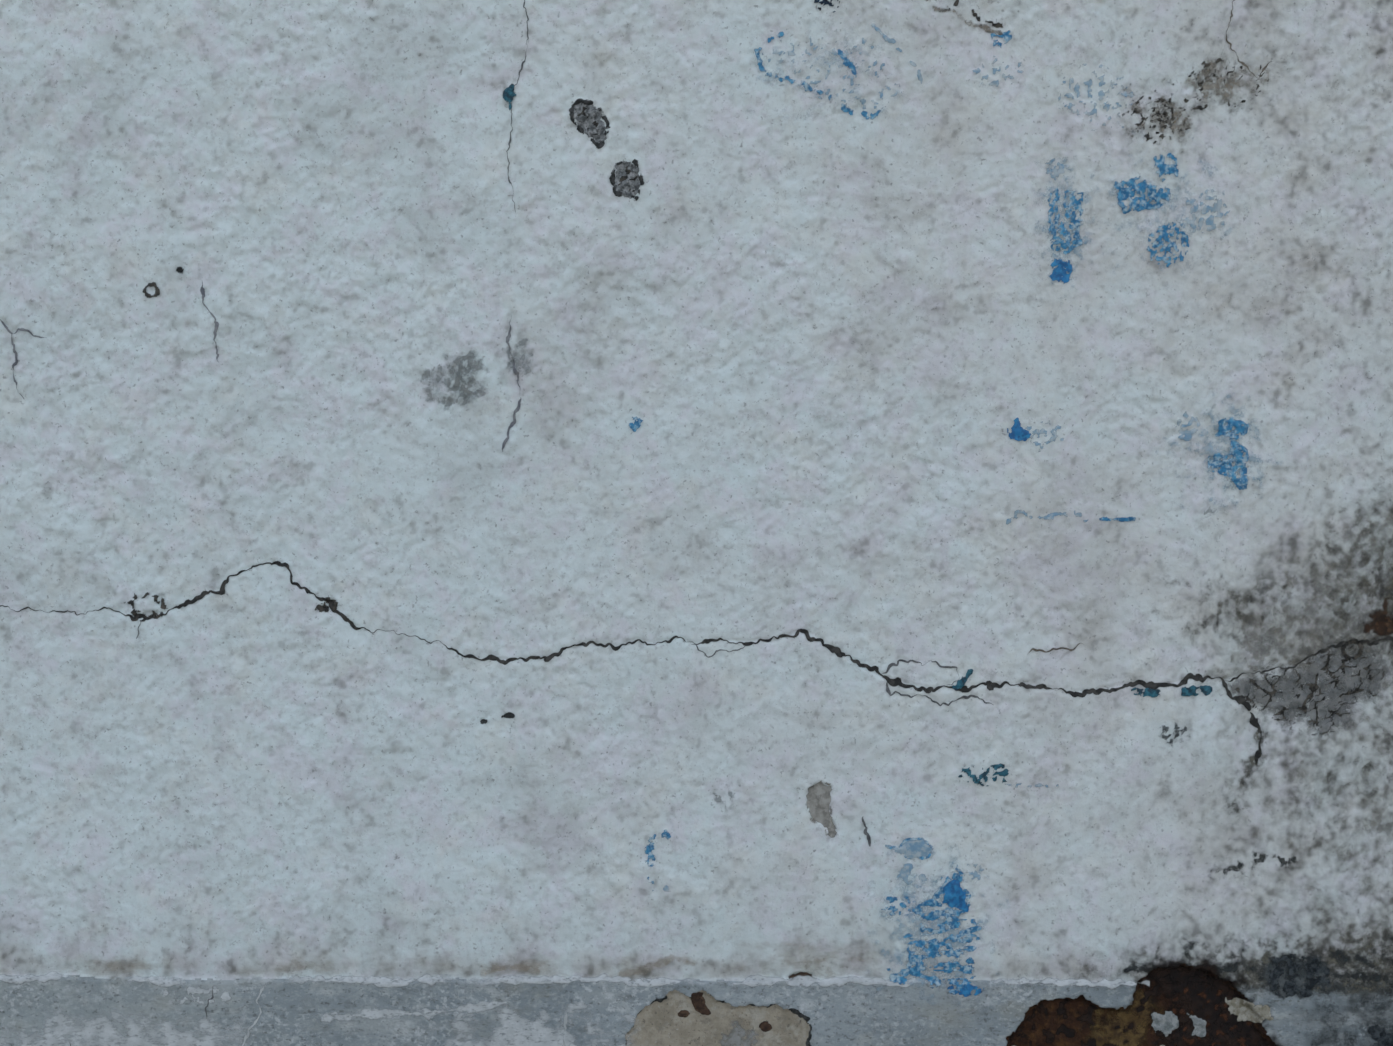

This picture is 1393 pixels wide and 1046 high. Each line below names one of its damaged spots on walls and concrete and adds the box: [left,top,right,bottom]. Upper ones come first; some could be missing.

flaking render [569,98,610,149]
flaking render [609,159,644,201]
peeling [1046,159,1083,255]
peeling [1114,58,1269,267]
peeling [1177,412,1200,441]
peeling [1208,417,1249,490]
crack [0,561,1393,765]
flaking render [806,781,837,838]
peeling [886,839,932,859]
peeling [887,865,984,997]
spalling [625,990,812,1046]